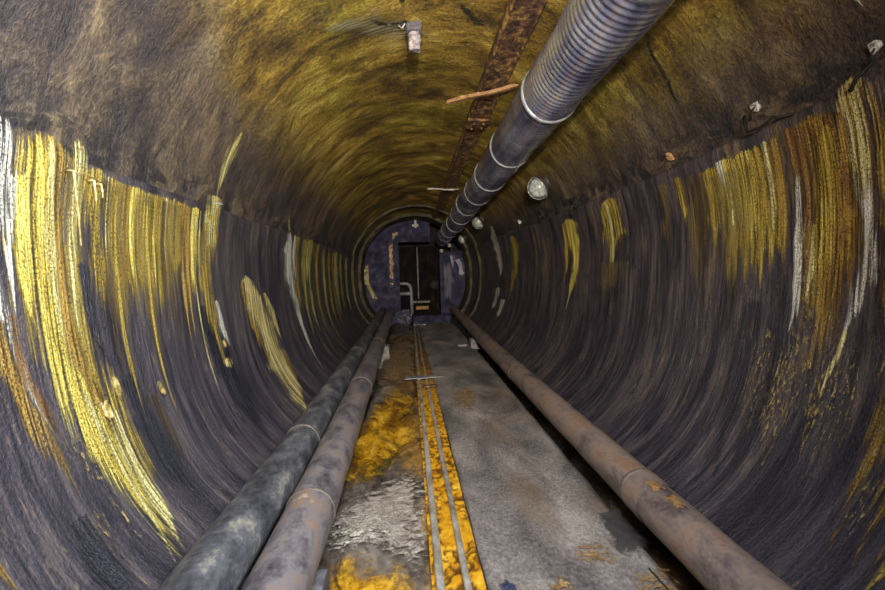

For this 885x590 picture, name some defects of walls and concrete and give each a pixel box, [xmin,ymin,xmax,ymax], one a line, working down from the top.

damp [0,118,264,556]
damp [240,275,307,410]
damp [562,219,580,307]
damp [601,198,629,313]
damp [660,138,788,305]
damp [805,77,885,393]